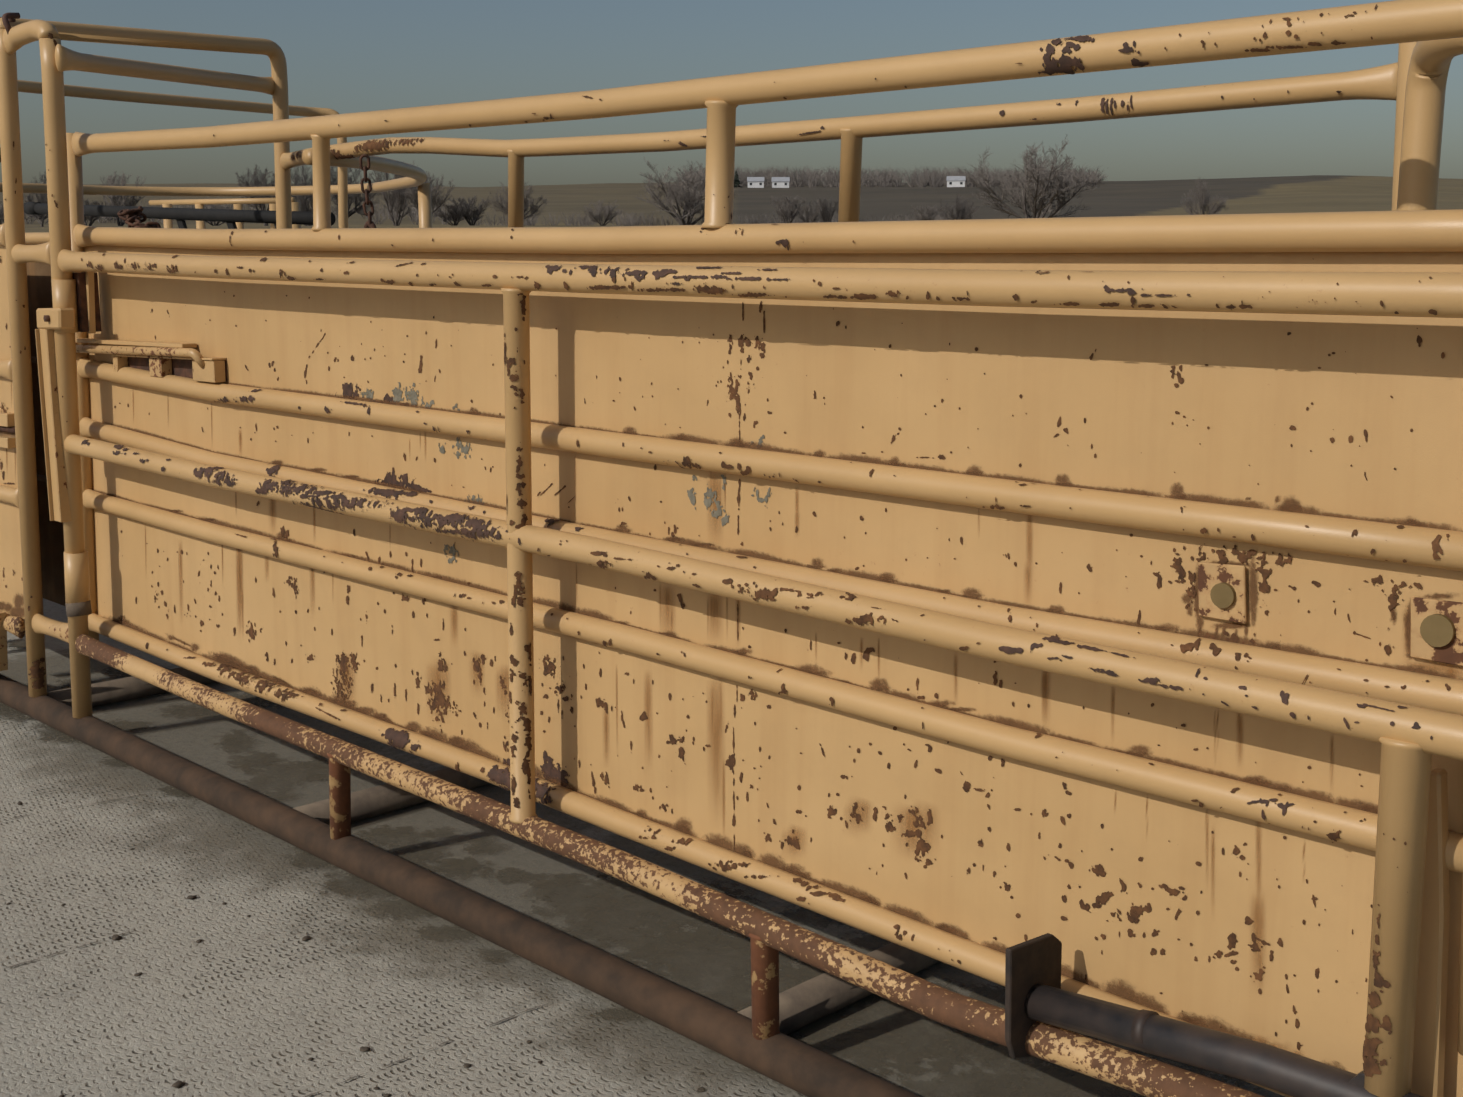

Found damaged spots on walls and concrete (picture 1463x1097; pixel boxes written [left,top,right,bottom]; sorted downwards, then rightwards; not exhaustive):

peeling [1038,35,1094,75]
peeling [482,265,790,290]
peeling [255,316,583,571]
peeling [330,592,510,765]
corrosion [94,490,1006,964]
peeling [539,652,710,813]
corrosion [113,425,1453,679]
peeling [722,556,897,664]
peeling [827,742,943,879]
corrosion [709,646,1378,814]
peeling [1014,808,1283,994]
corrosion [1061,965,1260,1042]